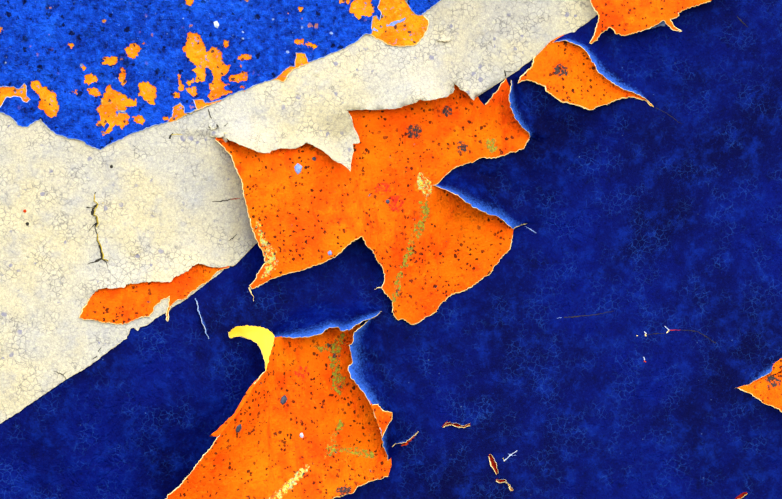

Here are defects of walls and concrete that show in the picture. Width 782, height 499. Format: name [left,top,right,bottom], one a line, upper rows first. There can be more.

peeling [0,80,59,118]
peeling [72,42,157,136]
peeling [163,32,252,122]
peeling [209,0,711,325]
crack [86,192,114,267]
peeling [79,264,230,339]
peeling [166,301,419,499]
peeling [442,415,476,428]
peeling [732,330,782,412]
peeling [488,448,520,491]